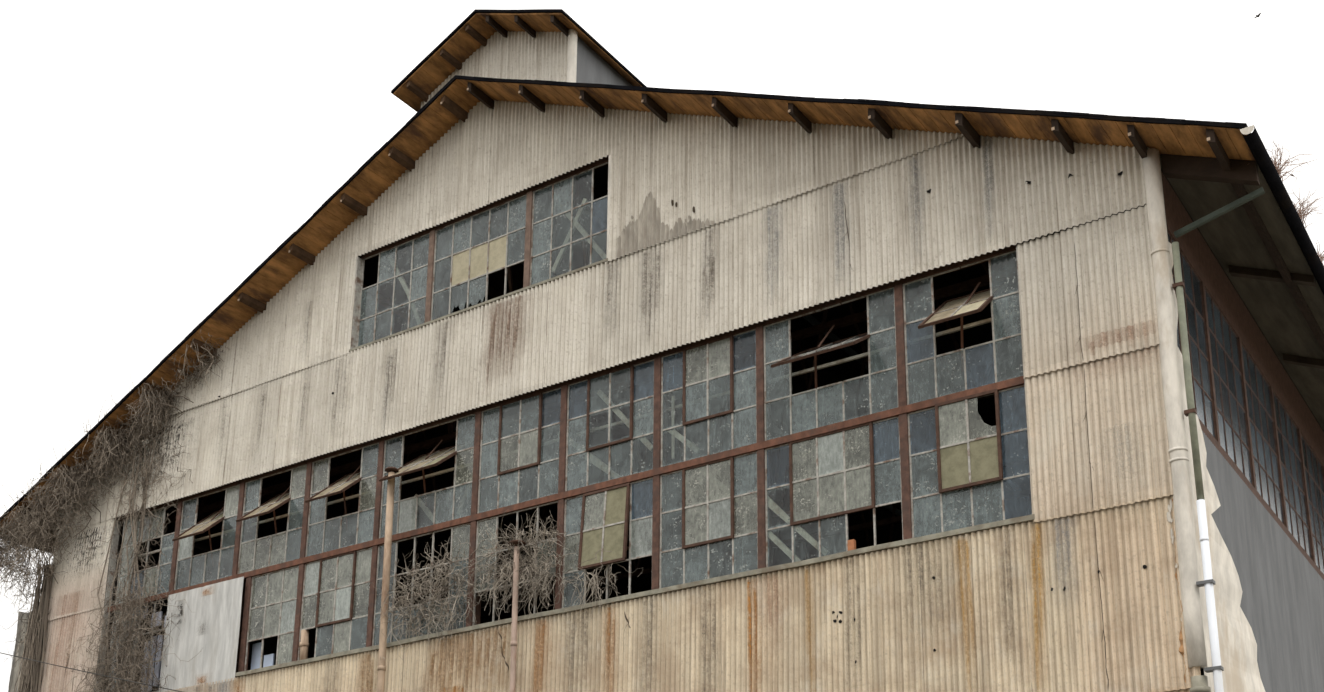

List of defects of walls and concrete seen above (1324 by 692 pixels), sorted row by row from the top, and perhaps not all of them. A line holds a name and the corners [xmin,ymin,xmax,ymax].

rust [747,582,757,687]